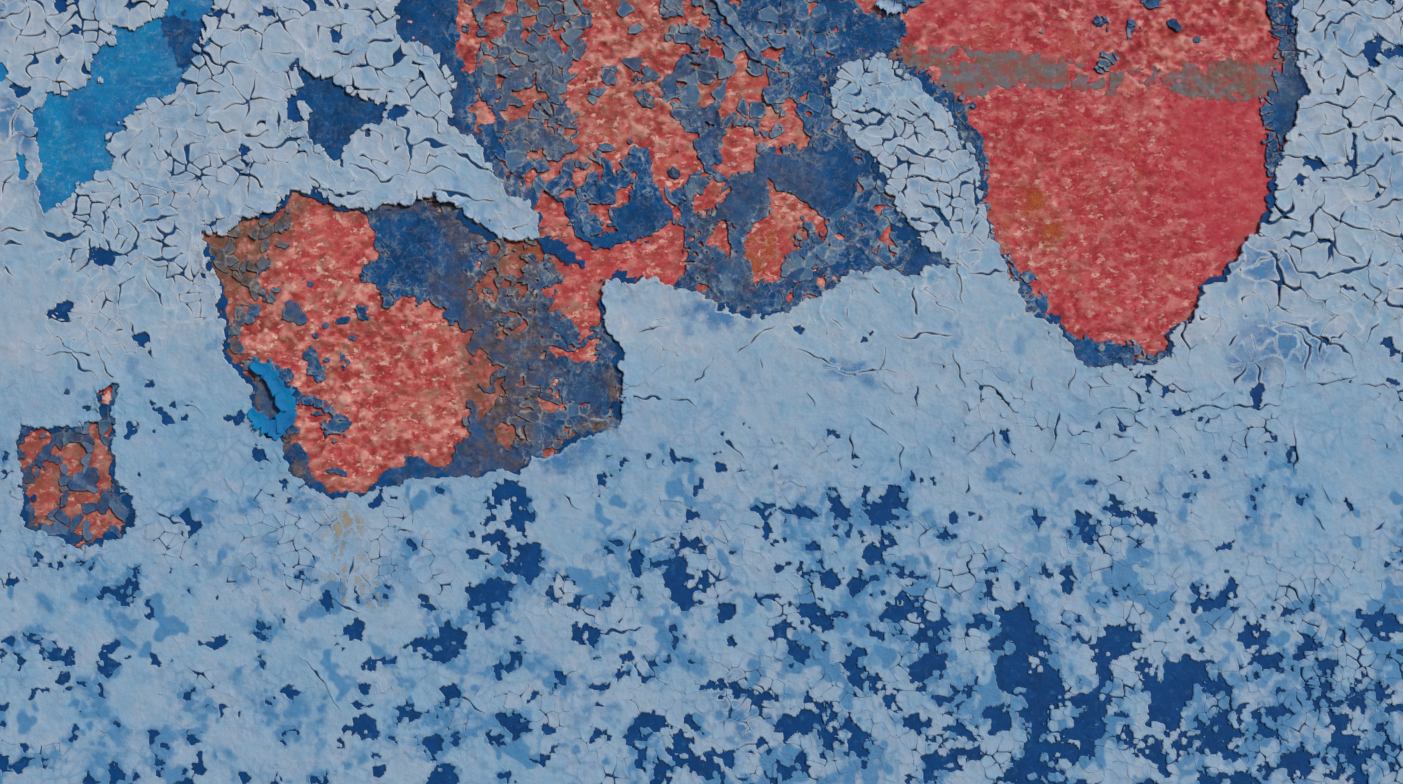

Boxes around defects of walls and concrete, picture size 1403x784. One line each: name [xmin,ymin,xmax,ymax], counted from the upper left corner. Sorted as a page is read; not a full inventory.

crack [1,195,183,332]
peeling [0,368,190,588]
peeling [0,0,280,239]
crack [245,113,301,149]
crack [310,120,495,202]
peeling [189,0,1342,707]
crack [839,88,1000,293]
crack [807,289,1032,493]
crack [1282,88,1403,388]
spalling [0,632,131,700]
spalling [337,683,461,784]
spalling [586,471,1403,784]